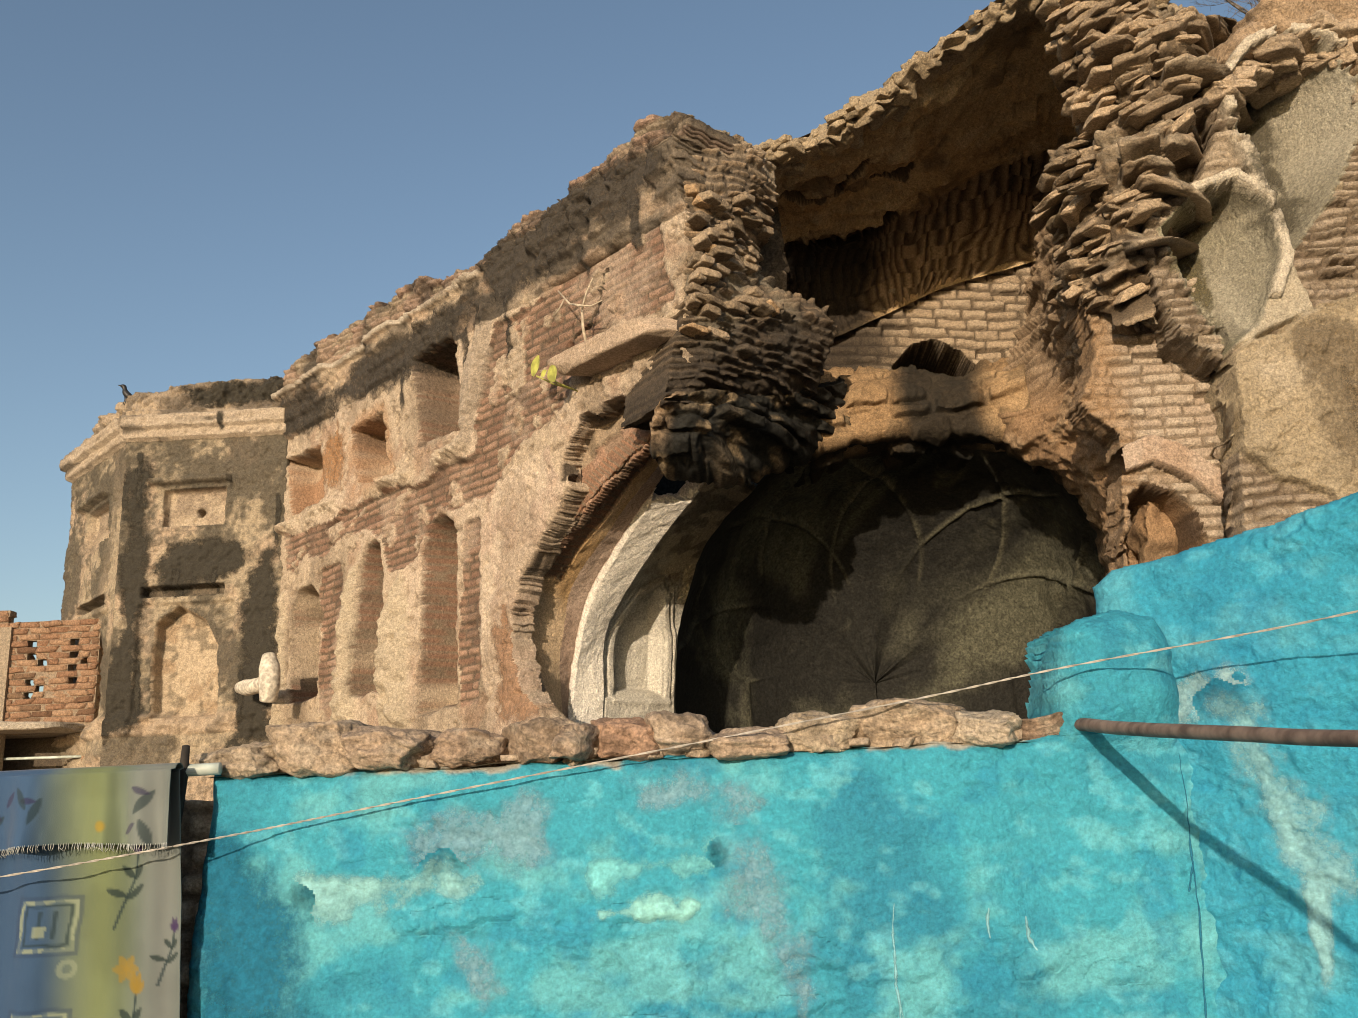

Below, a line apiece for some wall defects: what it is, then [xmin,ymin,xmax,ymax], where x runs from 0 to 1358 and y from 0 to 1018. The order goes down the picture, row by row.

flaking render [1293,141,1358,308]
spalling [998,226,1125,577]
flaking render [1238,448,1333,531]
spalling [1125,501,1178,564]
peeling [1178,667,1263,726]
peeling [586,859,700,922]
peeling [668,840,715,877]
crack [1179,755,1207,1018]
peeling [1234,742,1358,981]